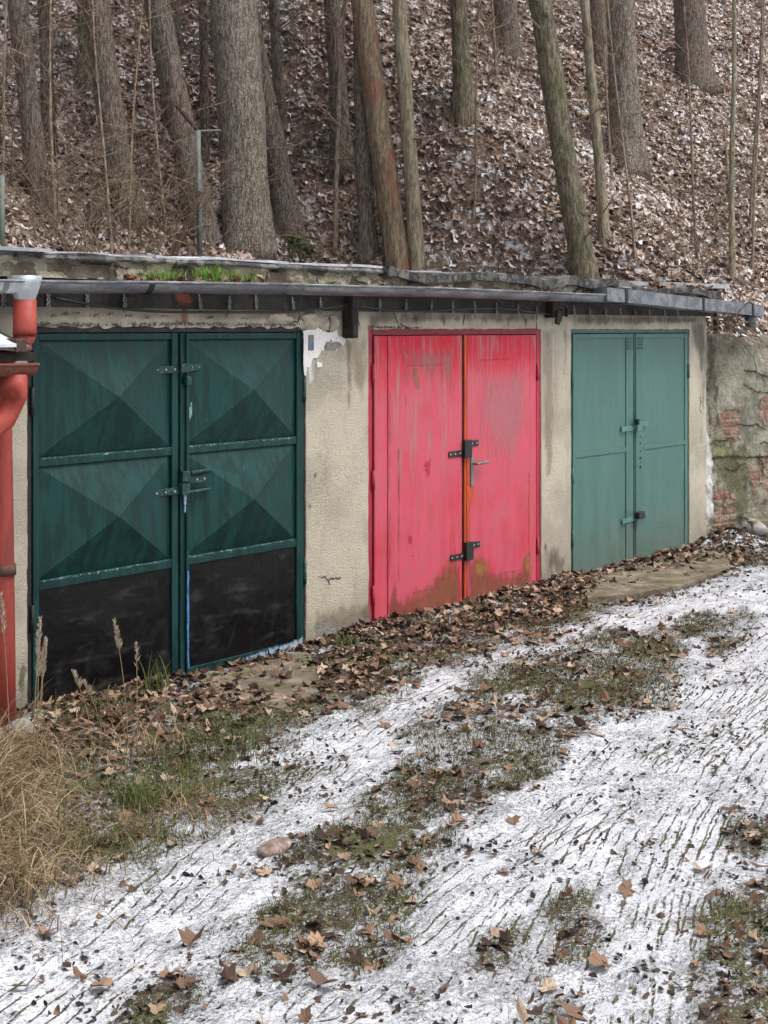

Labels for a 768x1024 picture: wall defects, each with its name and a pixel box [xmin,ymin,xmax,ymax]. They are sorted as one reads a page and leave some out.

peeling [37,311,346,383]
crack [744,369,768,393]
peeling [706,430,737,528]
peeling [718,407,743,442]
crack [711,423,768,473]
peeling [746,451,768,495]
corrosion [391,555,530,614]